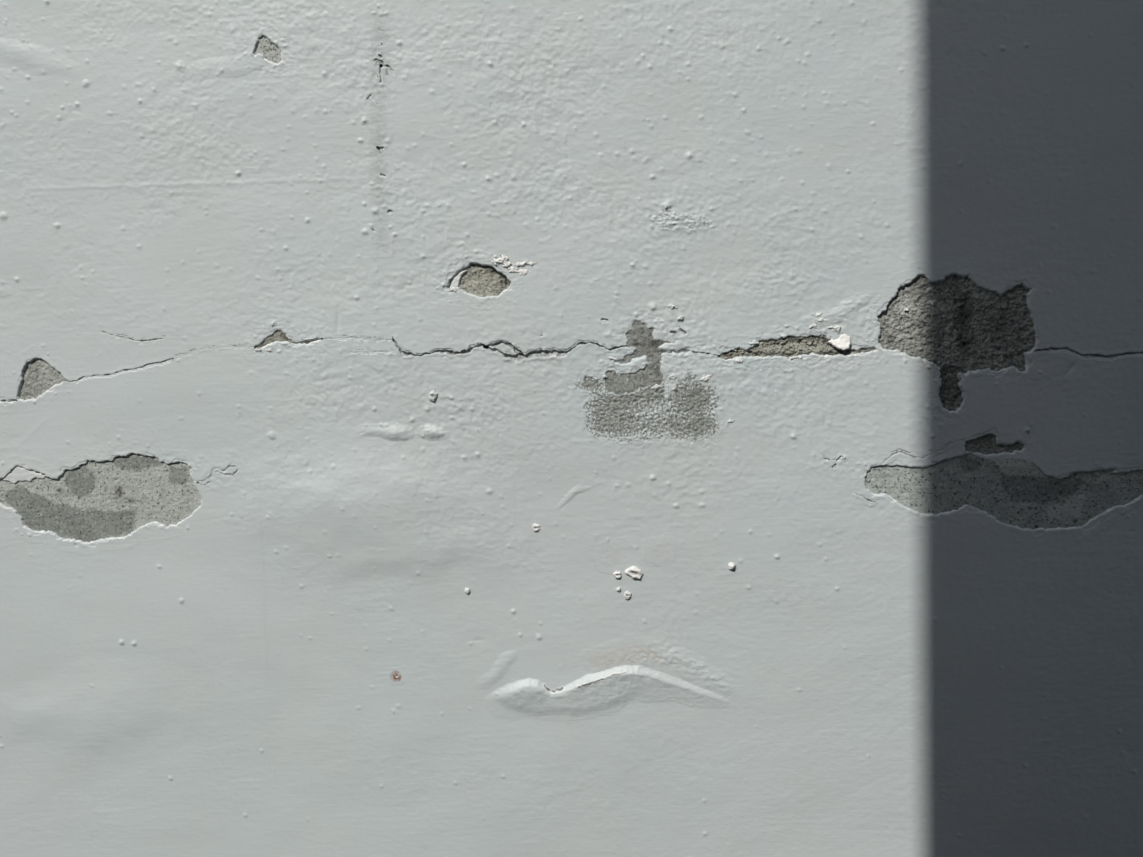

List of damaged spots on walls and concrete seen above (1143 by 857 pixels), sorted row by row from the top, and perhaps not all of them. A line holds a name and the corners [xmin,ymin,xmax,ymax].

peeling [240,21,294,78]
spalling [433,249,537,311]
crack [0,387,26,415]
peeling [4,345,76,414]
crack [63,328,176,383]
crack [319,315,636,365]
crack [669,325,726,363]
peeling [566,258,1143,544]
crack [1034,343,1143,362]
peeling [0,440,205,556]